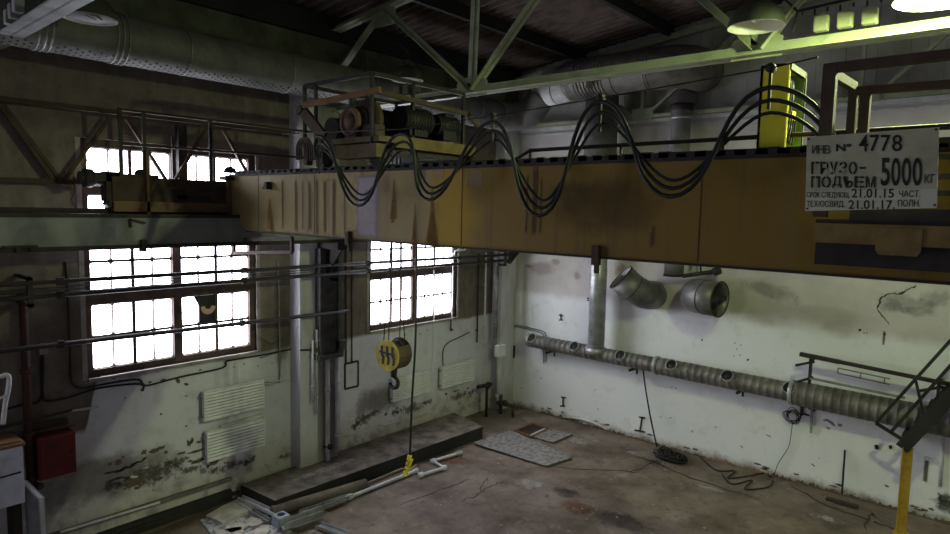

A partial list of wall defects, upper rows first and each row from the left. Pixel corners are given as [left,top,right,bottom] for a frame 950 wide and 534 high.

crack [877,286,916,324]
peeling [141,425,219,469]
crack [400,478,503,505]